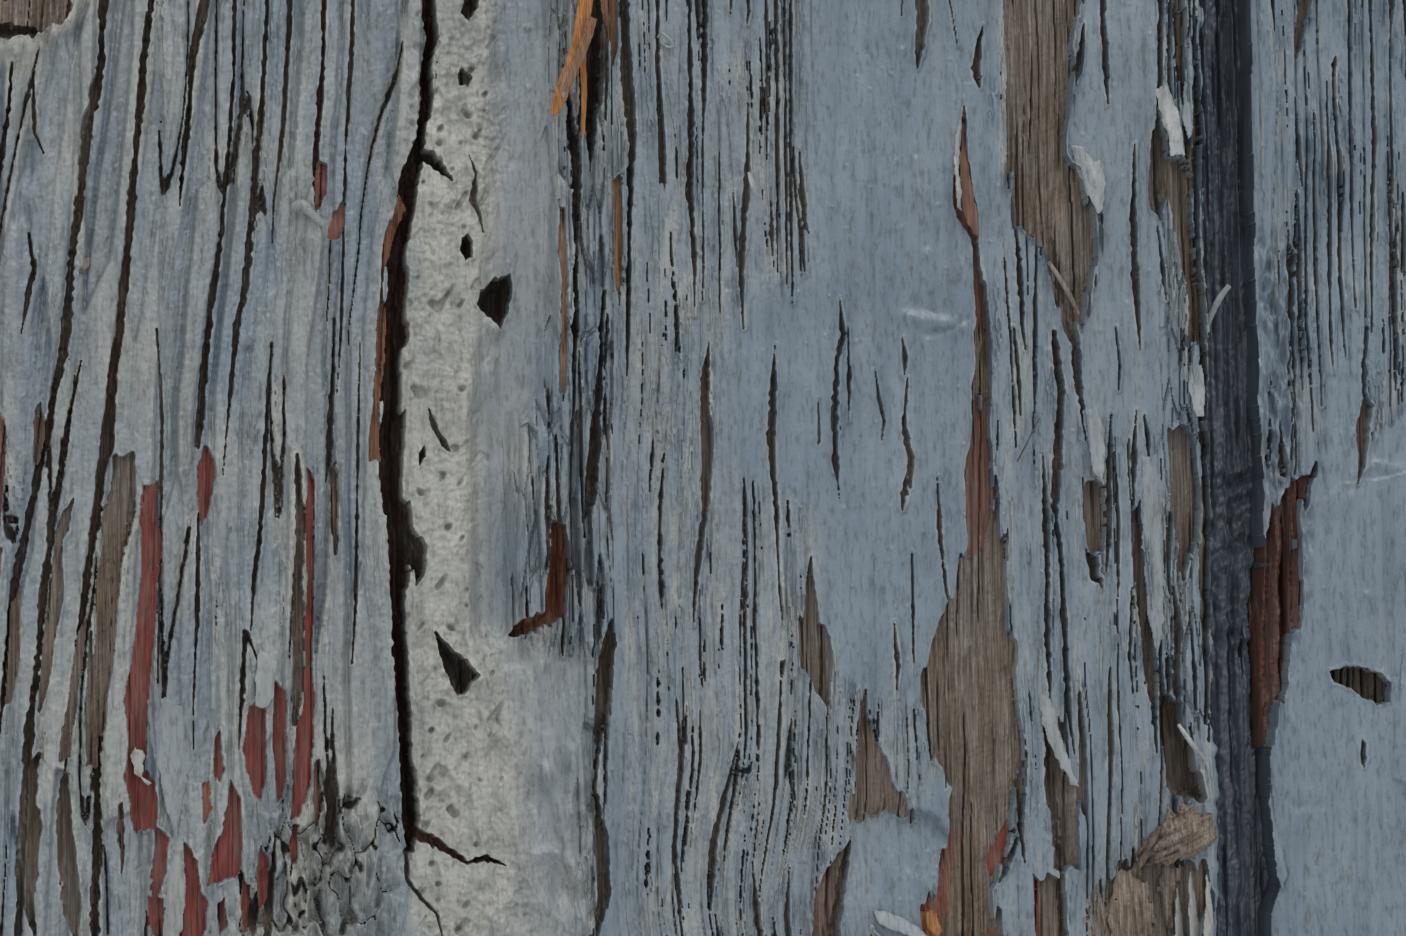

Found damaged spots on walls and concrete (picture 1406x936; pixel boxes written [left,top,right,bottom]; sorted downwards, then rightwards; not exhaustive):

peeling [1003,0,1106,338]
spalling [429,415,448,451]
peeling [869,98,1017,936]
peeling [1246,467,1313,748]
peeling [255,649,278,708]
peeling [130,697,192,936]
peeling [812,843,848,936]
peeling [847,690,915,824]
peeling [1099,849,1213,936]
peeling [1268,778,1287,892]